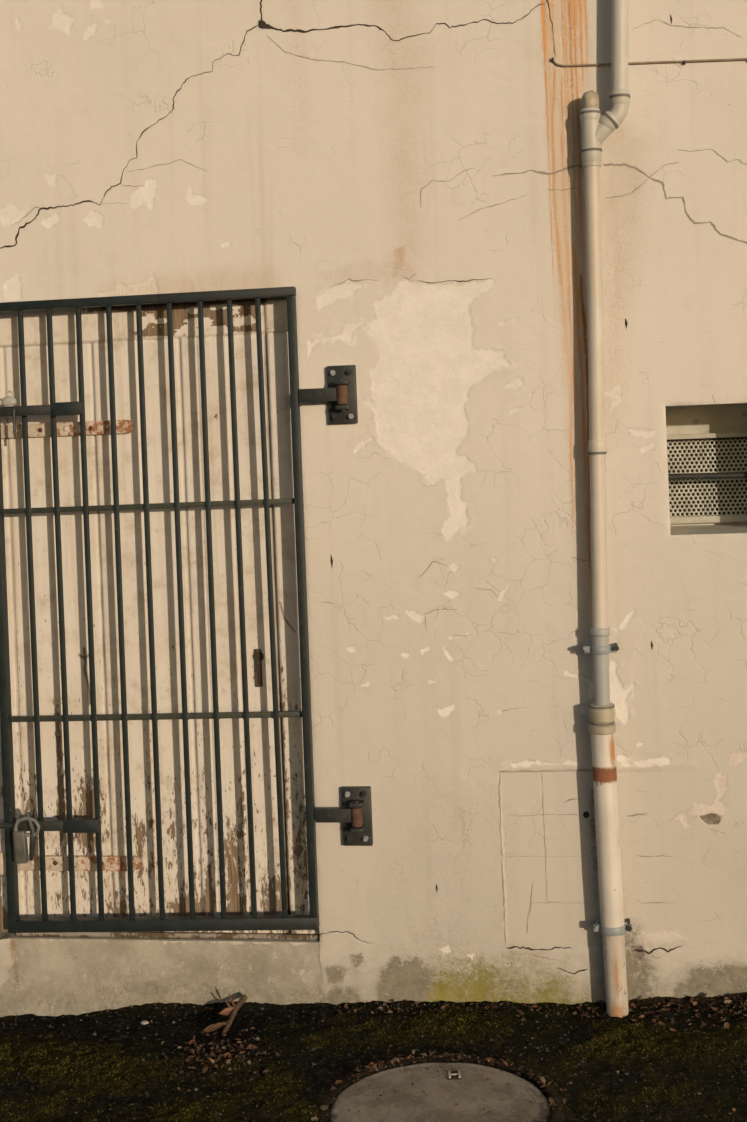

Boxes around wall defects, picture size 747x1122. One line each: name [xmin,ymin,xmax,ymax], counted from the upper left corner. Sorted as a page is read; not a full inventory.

crack [0,0,556,249]
crack [420,149,747,243]
peeling [3,272,23,302]
peeling [98,274,158,297]
crack [335,274,491,286]
corrosion [535,0,596,644]
peeling [511,759,580,769]
corrosion [592,735,617,783]
peeling [675,750,747,830]
leakage [0,776,551,1017]
crack [499,770,597,974]
crack [633,946,681,959]